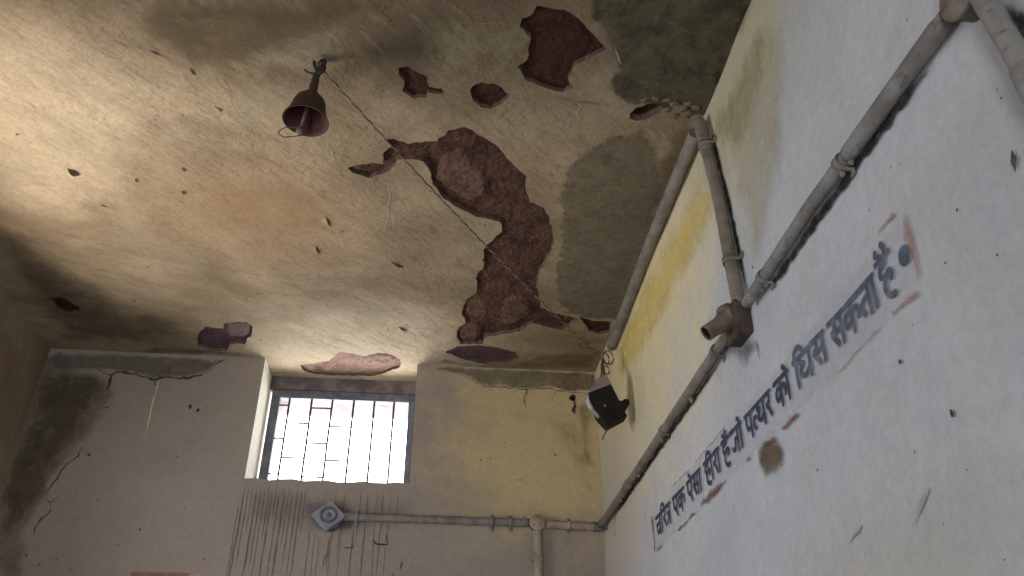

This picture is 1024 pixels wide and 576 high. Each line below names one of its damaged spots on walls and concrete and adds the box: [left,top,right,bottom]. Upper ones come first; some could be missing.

flaking render [398,66,443,99]
flaking render [470,83,510,109]
flaking render [517,5,606,92]
flaking render [630,97,701,121]
water stain [592,0,751,115]
water stain [556,131,678,320]
flaking render [348,127,611,414]
flaking render [197,322,261,351]
crack [63,359,225,429]
crack [34,447,82,535]
water stain [0,351,219,574]
corrosion [759,444,781,474]